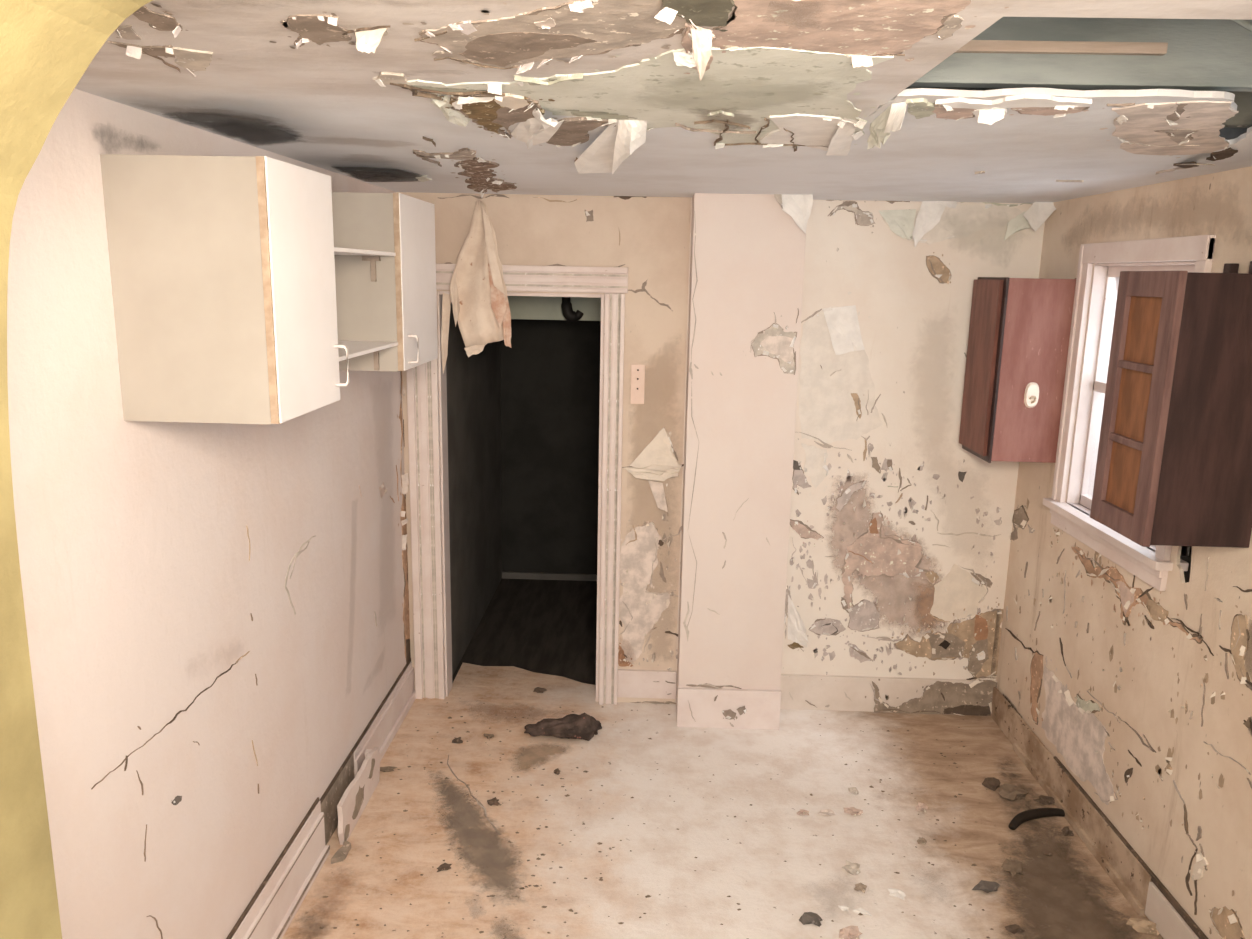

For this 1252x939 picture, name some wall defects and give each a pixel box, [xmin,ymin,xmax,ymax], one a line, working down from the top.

peeling [108,3,220,77]
flaking render [413,136,517,197]
peeling [270,0,1239,175]
peeling [619,427,684,671]
flaking render [743,292,1252,829]
crack [91,651,258,862]
crack [1005,570,1154,752]
crack [1184,557,1252,789]
crack [147,915,163,939]
crack [1173,780,1208,915]
flaking render [1204,890,1245,939]